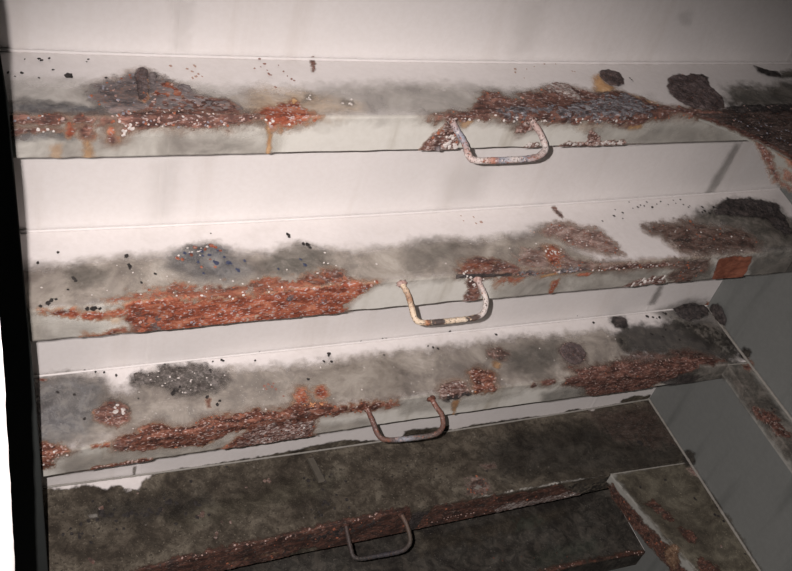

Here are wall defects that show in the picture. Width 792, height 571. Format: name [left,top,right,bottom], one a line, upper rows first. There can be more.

damp [11,134,272,158]
rust [9,64,353,158]
damp [305,87,492,113]
rust [427,82,792,192]
damp [727,82,792,106]
rust [37,268,379,338]
damp [23,229,665,313]
rust [455,206,763,301]
rust [83,378,400,470]
damp [34,303,792,460]
rust [530,348,727,396]
damp [42,395,758,571]